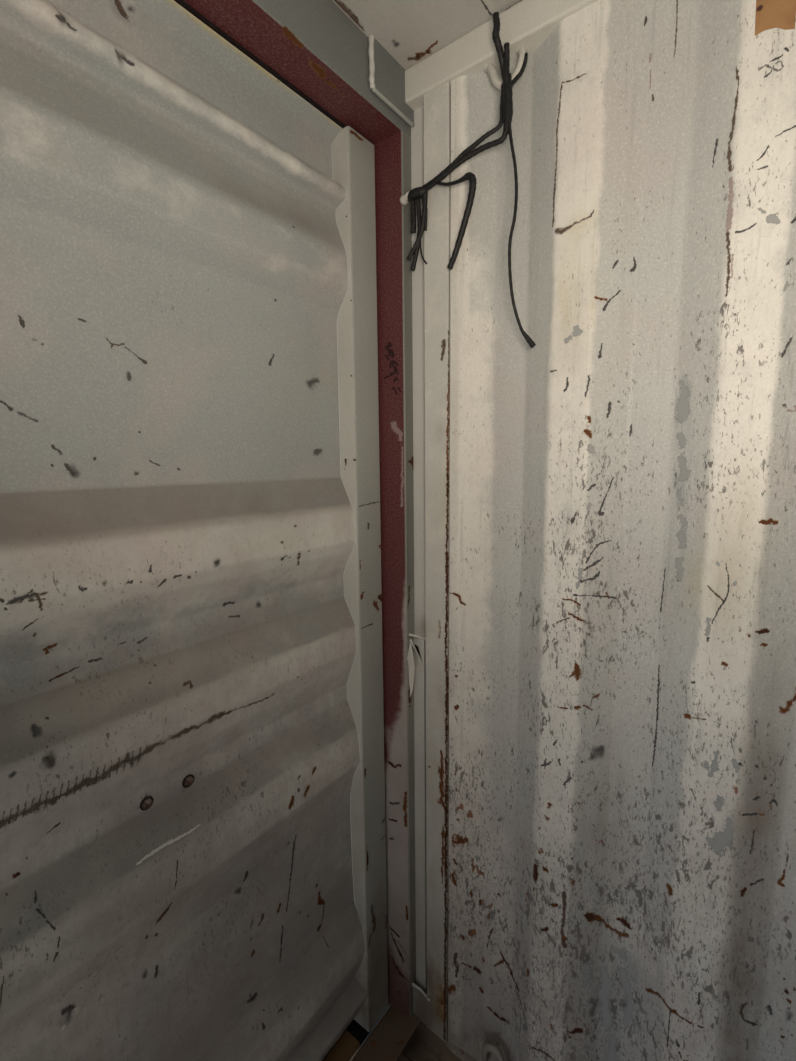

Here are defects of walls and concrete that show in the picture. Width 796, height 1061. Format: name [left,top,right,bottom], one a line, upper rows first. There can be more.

rust [334,0,364,31]
rust [428,330,481,1041]